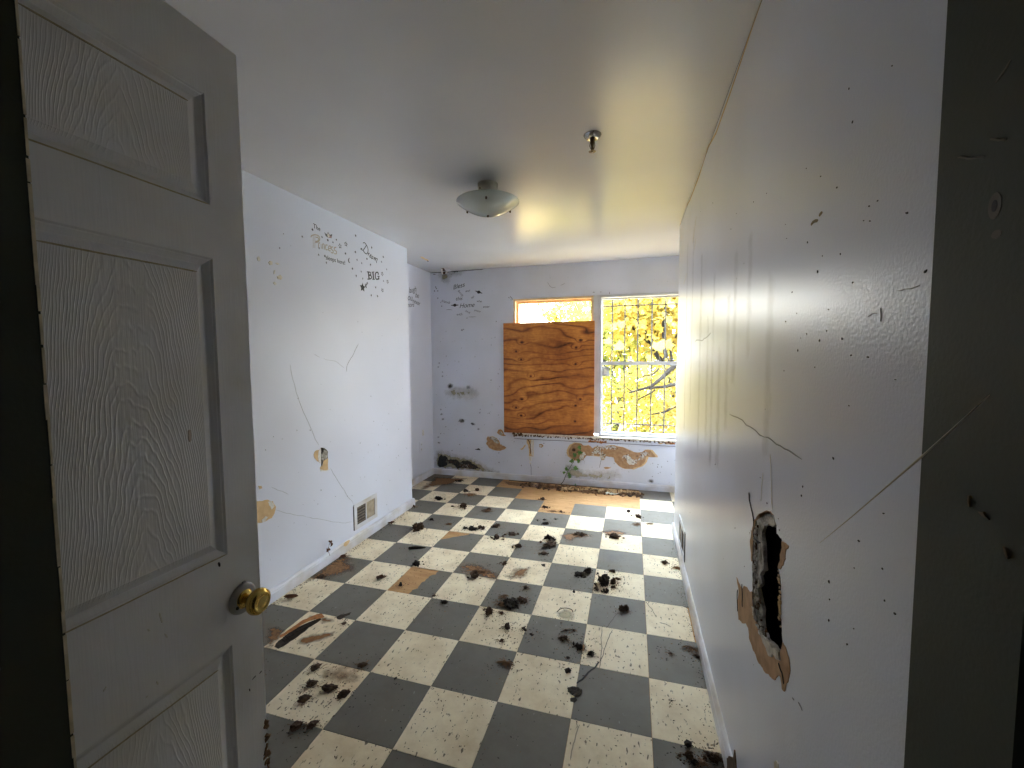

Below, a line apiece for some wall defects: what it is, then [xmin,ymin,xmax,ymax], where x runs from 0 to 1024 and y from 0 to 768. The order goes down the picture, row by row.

spalling [314,448,330,471]
damp [423,407,481,489]
peeling [475,429,506,451]
peeling [567,442,658,470]
peeling [257,486,276,523]
spalling [736,510,791,692]